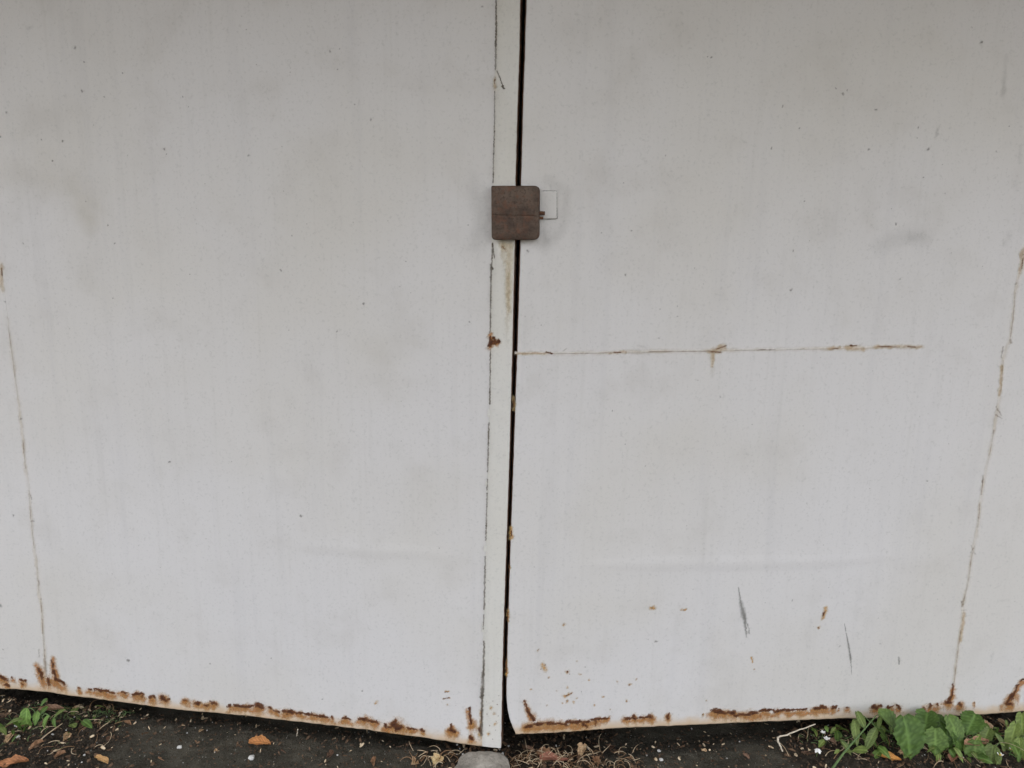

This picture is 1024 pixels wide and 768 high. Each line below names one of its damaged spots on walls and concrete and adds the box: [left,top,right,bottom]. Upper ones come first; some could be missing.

corrosion [487,333,501,349]
corrosion [0,657,425,735]
corrosion [446,704,498,744]
corrosion [522,689,670,732]
corrosion [702,705,850,721]
corrosion [871,704,901,713]
corrosion [1001,679,1024,710]